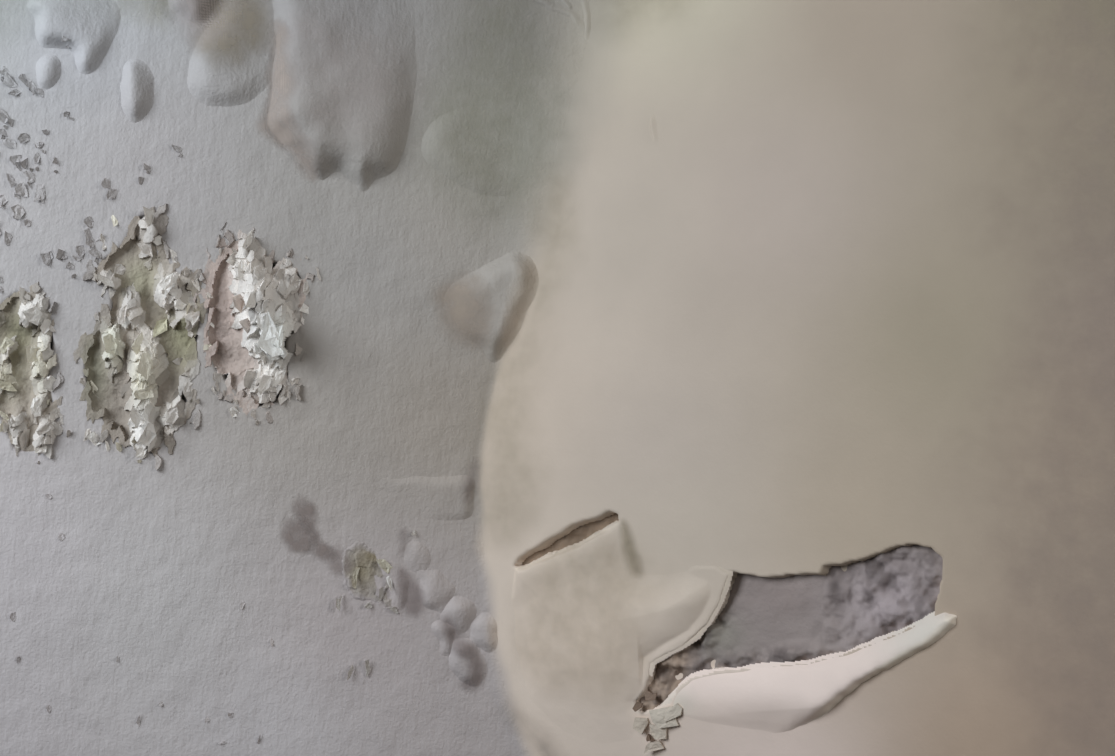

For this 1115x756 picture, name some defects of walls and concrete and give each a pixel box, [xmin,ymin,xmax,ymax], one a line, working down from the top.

peeling [0,66,44,97]
peeling [0,109,58,226]
peeling [101,178,117,200]
flaking render [0,203,321,471]
peeling [336,542,398,613]
flaking render [511,513,957,754]